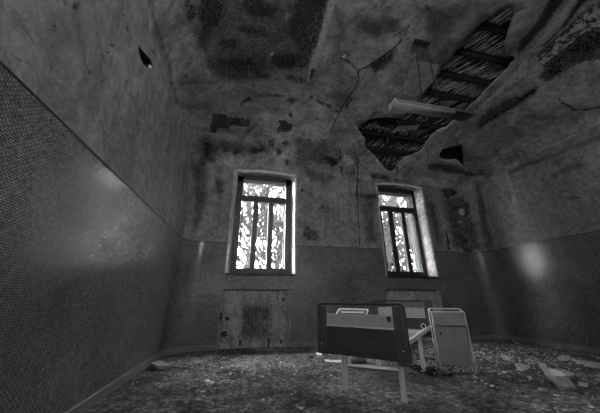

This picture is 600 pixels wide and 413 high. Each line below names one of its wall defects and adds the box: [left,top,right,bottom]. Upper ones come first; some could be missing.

spalling [138,47,152,68]
leakage [185,0,325,83]
crack [330,24,411,134]
peeling [538,2,600,67]
flaking render [210,114,250,133]
flaking render [259,120,293,148]
crack [354,153,362,245]